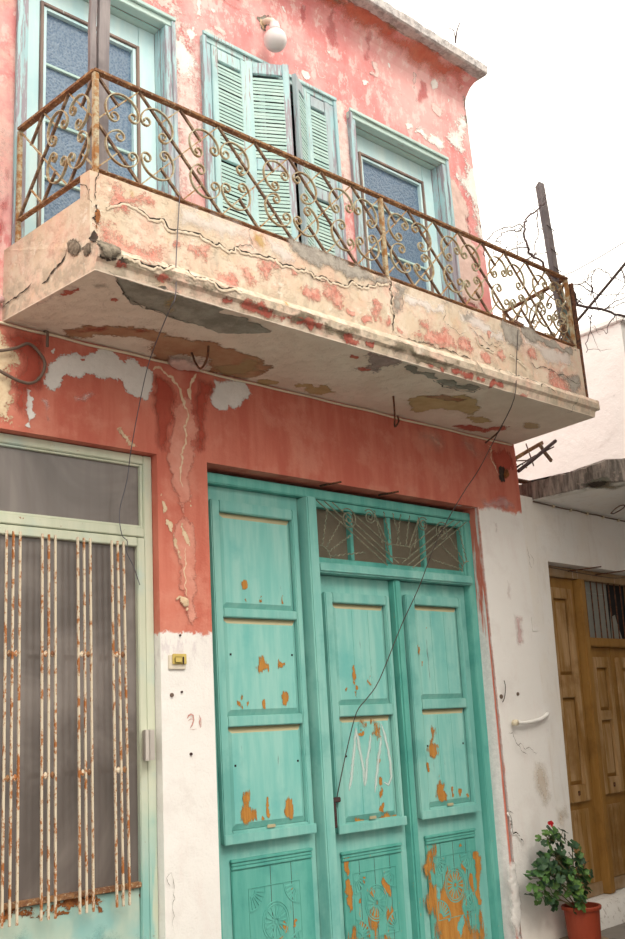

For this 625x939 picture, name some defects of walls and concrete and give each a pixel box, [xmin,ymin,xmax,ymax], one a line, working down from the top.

peeling [143,0,226,204]
peeling [336,100,353,204]
peeling [406,99,483,239]
spalling [67,172,271,334]
crack [106,202,580,410]
peeling [322,280,373,325]
peeling [0,330,20,425]
peeling [43,347,154,400]
peeling [210,379,279,410]
peeling [295,383,334,395]
peeling [350,341,528,423]
leakage [61,324,274,625]